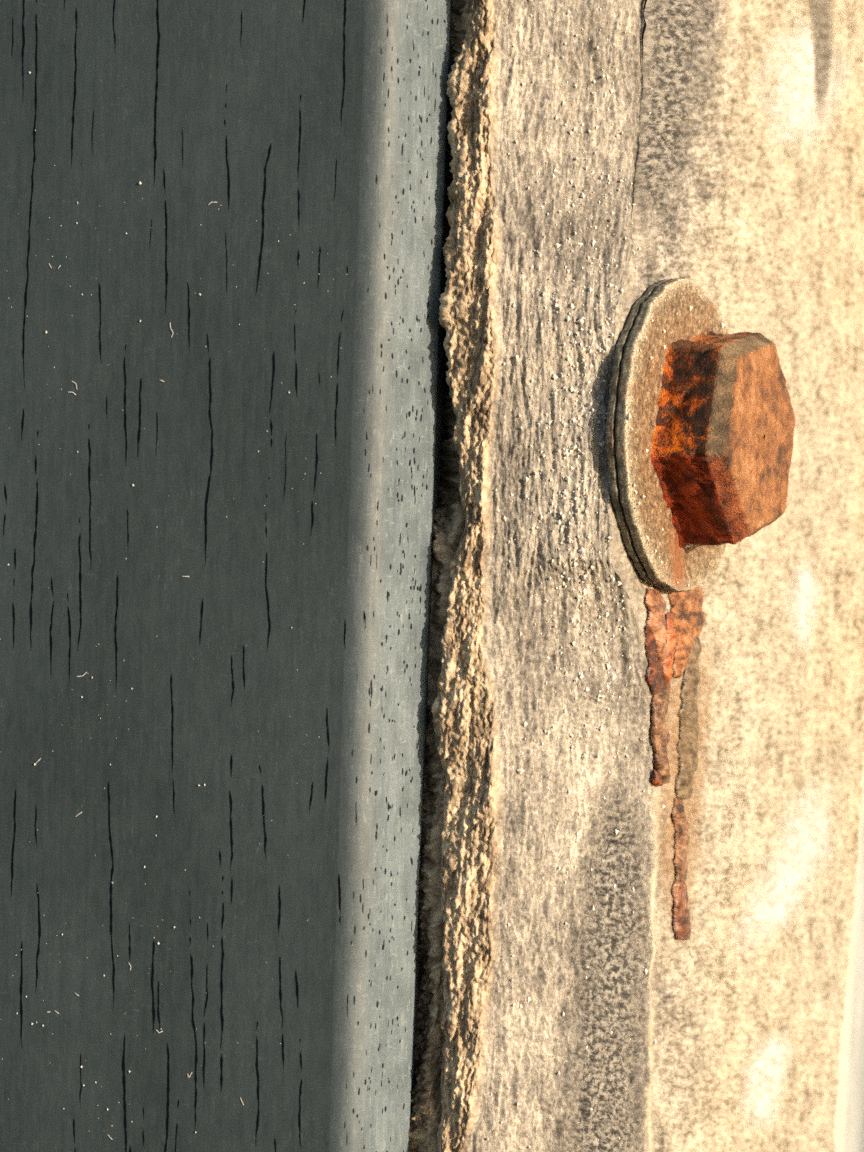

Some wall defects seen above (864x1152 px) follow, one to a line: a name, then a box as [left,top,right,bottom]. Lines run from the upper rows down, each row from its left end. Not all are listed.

crack [640,0,648,67]
rust [645,586,705,940]
leakage [563,768,648,1152]